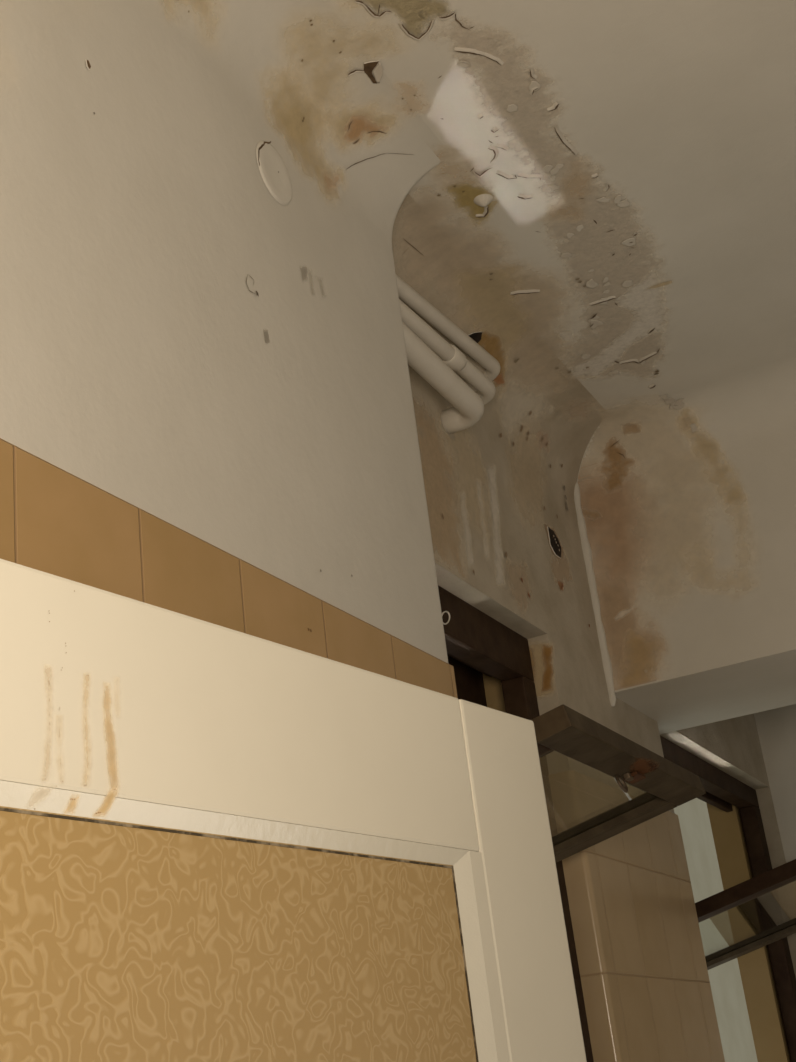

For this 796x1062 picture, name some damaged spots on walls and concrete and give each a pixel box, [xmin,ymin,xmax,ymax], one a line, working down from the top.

peeling [355,0,667,389]
damp [413,398,529,607]
damp [403,196,671,522]
spalling [545,525,564,559]
damp [578,394,744,691]